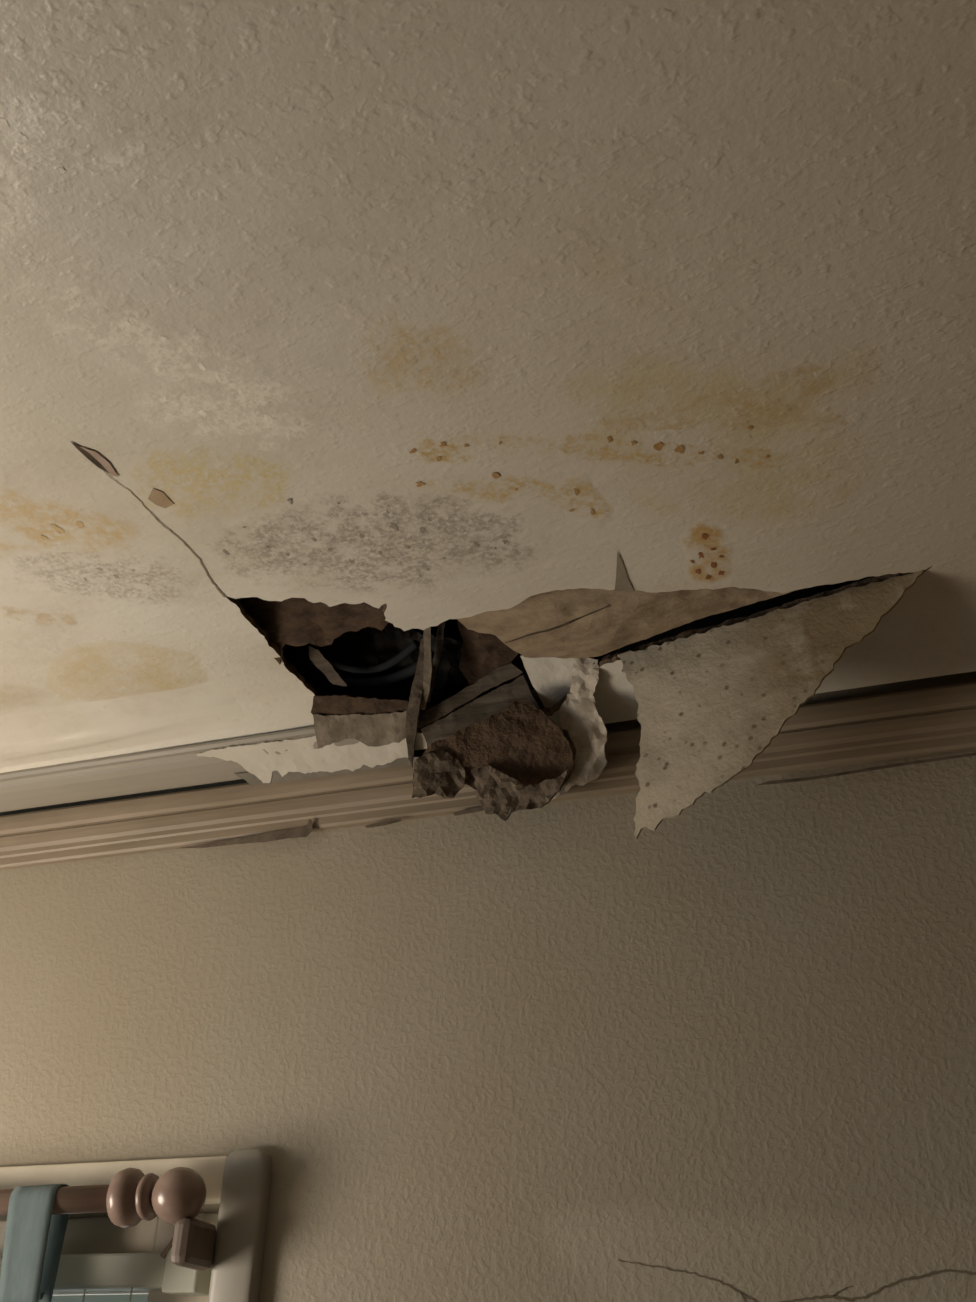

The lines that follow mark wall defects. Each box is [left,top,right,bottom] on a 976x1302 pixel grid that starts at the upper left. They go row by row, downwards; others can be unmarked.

damp [344,299,498,407]
damp [599,363,850,435]
crack [104,471,226,597]
damp [0,440,558,627]
damp [0,639,209,711]
spalling [282,631,351,695]
spalling [415,619,463,641]
spalling [426,653,535,706]
spalling [588,576,875,665]
crack [618,1259,976,1302]